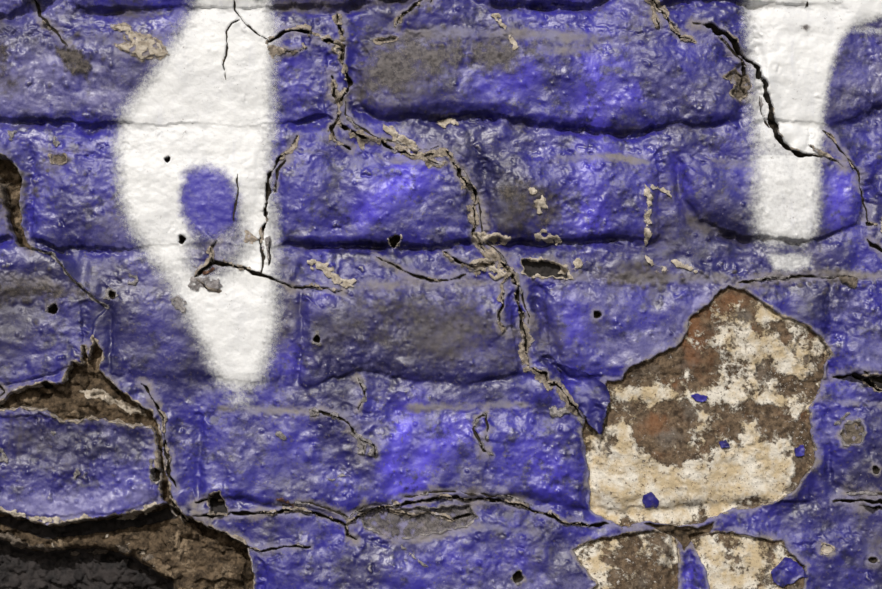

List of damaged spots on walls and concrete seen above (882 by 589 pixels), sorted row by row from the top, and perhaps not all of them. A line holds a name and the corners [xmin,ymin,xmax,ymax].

crack [193,135,342,293]
crack [222,0,585,419]
crack [644,0,882,252]
crack [739,275,854,283]
spalling [0,334,256,589]
crack [141,378,609,552]
peeling [557,286,835,589]
crack [832,491,882,509]
crack [833,371,882,391]